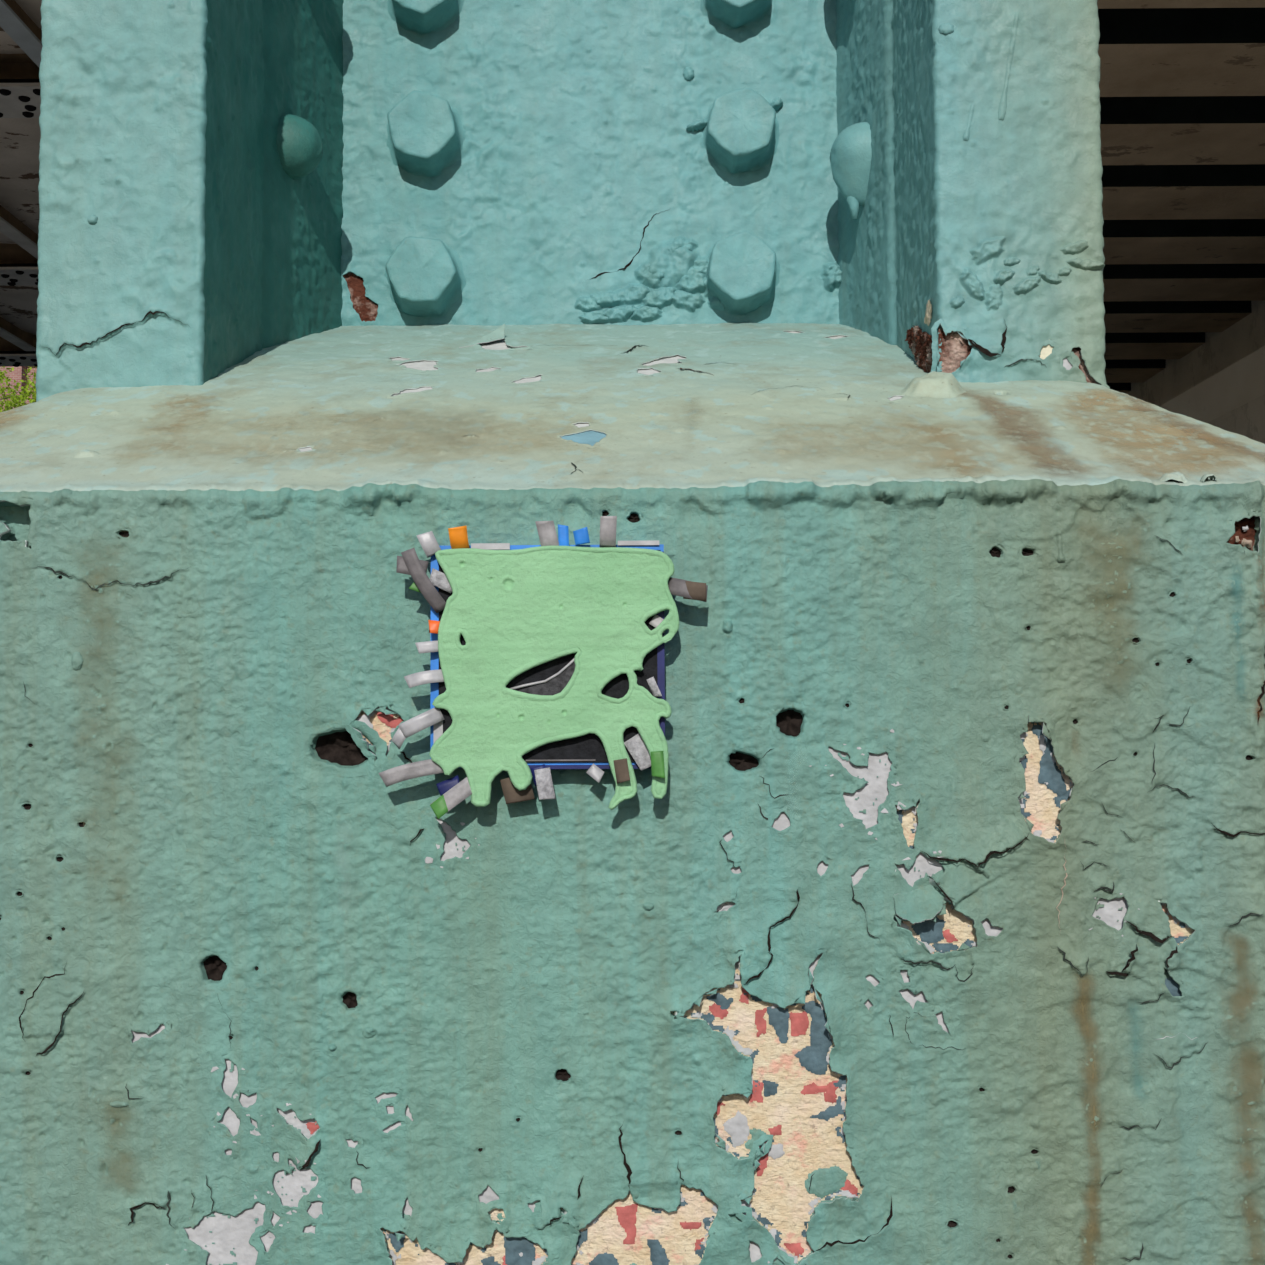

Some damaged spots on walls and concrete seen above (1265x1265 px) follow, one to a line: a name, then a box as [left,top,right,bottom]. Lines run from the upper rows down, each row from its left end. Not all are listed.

crack [45,311,190,356]
spalling [384,356,443,399]
spalling [632,354,691,377]
rust [1081,393,1232,455]
crack [36,565,195,590]
peeling [1011,710,1080,850]
spalling [810,729,1009,960]
crack [19,963,85,1056]
spalling [858,964,955,1040]
peeling [369,947,871,1265]
spalling [178,1053,330,1265]
spalling [344,1170,369,1200]